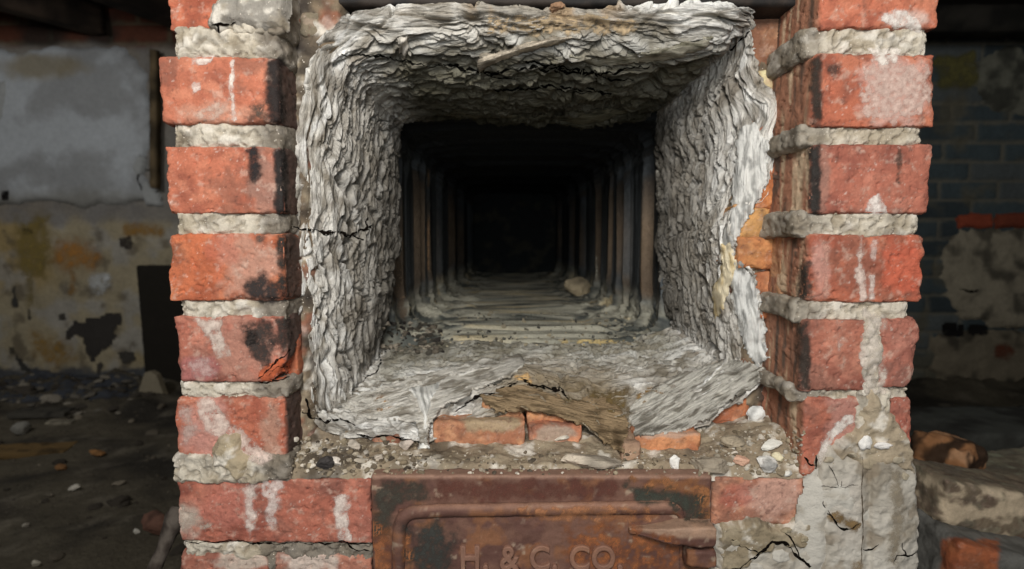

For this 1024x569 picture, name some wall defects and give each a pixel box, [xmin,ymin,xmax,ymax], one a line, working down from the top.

leakage [859,48,978,125]
crack [293,218,372,240]
flaking render [58,313,136,373]
spalling [258,349,292,384]
crack [455,378,569,412]
crack [302,398,408,440]
leakage [180,507,211,529]
leakage [244,480,283,531]
leakage [334,494,352,541]
corrosion [438,478,681,569]
crack [804,456,917,564]
crack [732,533,811,569]